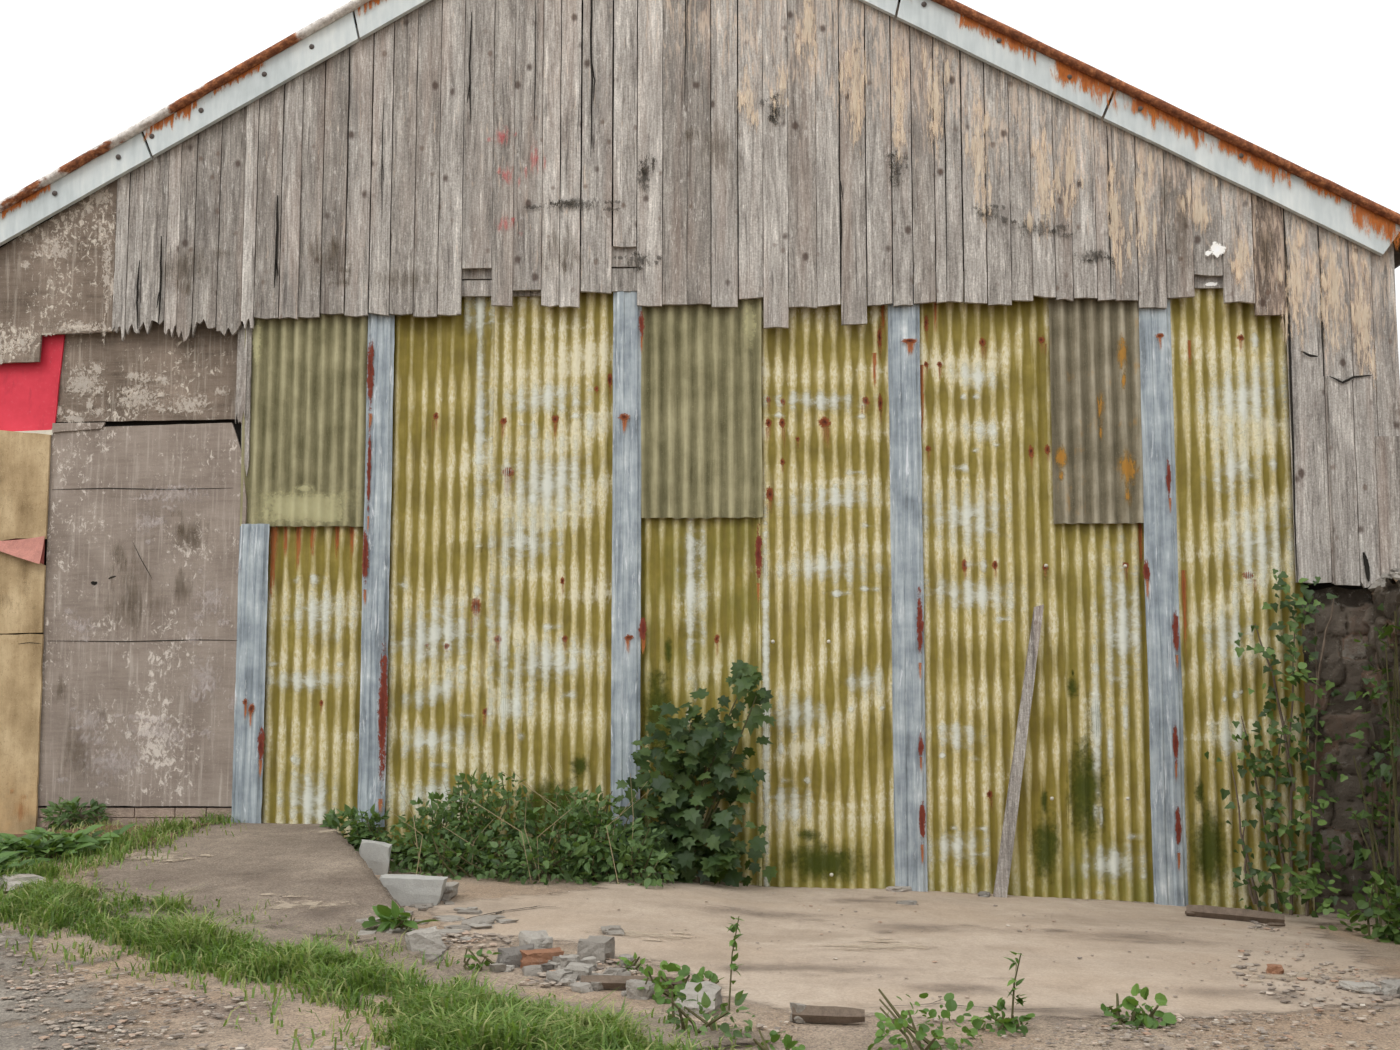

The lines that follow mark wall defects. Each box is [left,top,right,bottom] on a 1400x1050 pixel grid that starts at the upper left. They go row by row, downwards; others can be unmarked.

rust [145,100,197,139]
rust [959,14,1400,248]
rust [2,184,50,218]
peeling [0,536,45,564]
rust [916,587,924,678]
rust [1172,570,1187,667]
rust [377,637,388,811]
damp [526,783,579,834]
damp [571,758,586,774]
damp [785,830,853,878]
damp [1033,792,1060,875]
damp [1069,706,1104,836]